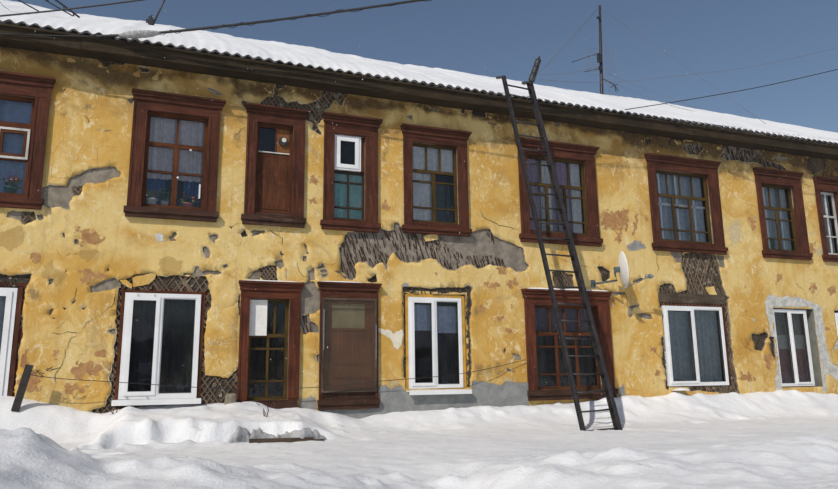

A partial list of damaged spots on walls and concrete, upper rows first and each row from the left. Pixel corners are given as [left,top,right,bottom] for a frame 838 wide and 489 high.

flaking render [241,84,348,135]
flaking render [6,167,121,225]
flaking render [201,233,219,259]
flaking render [247,252,284,281]
flaking render [300,222,529,334]
flaking render [597,266,609,282]
crack [55,291,116,382]
flaking render [64,263,238,414]
flaking render [378,286,486,388]
flaking render [651,337,668,390]
flaking render [659,252,756,394]
flaking render [751,332,775,370]